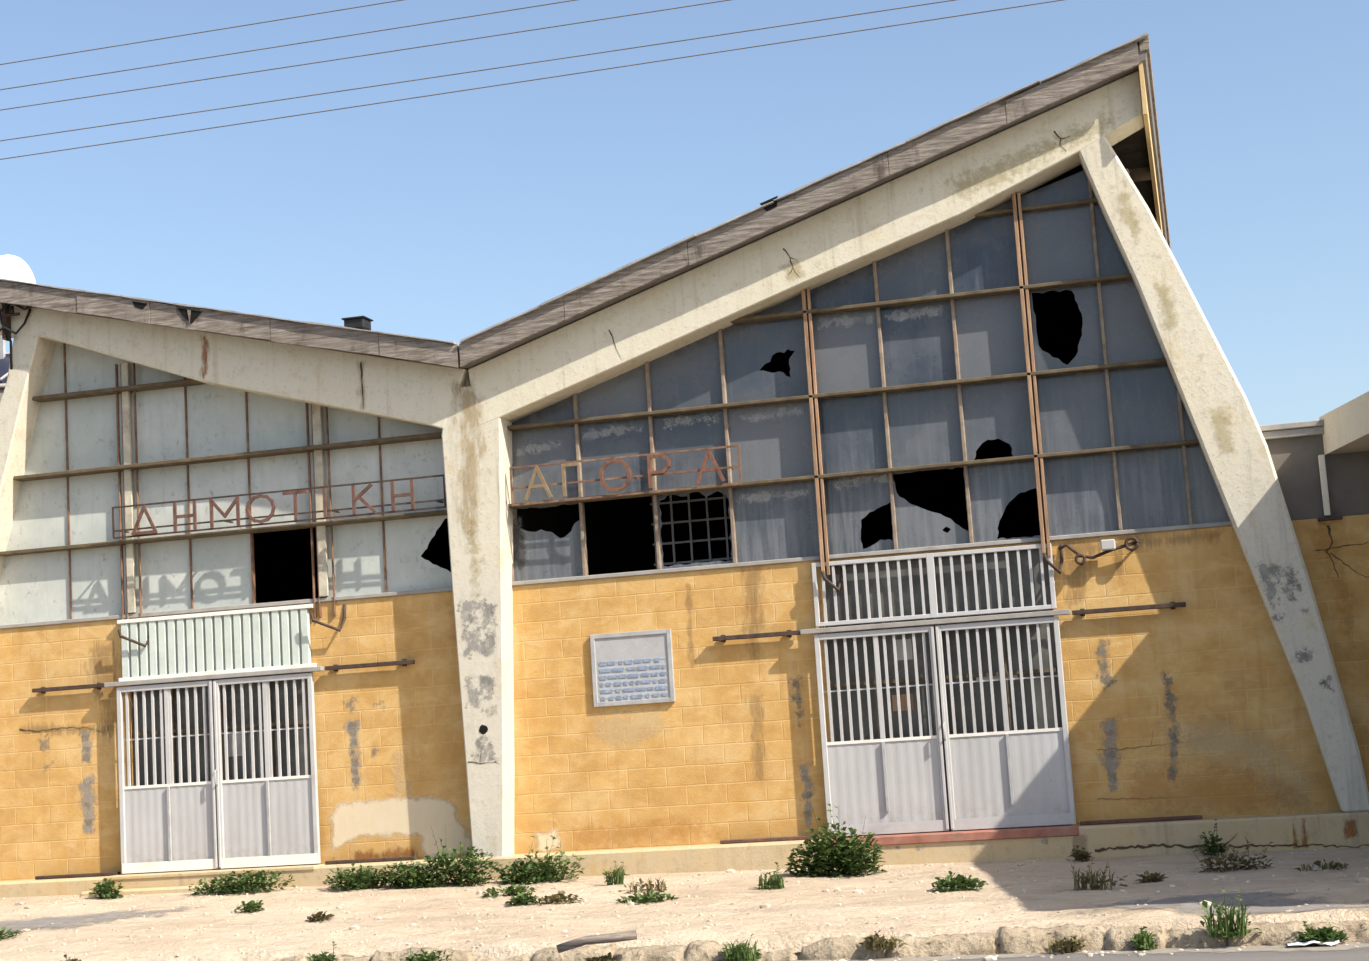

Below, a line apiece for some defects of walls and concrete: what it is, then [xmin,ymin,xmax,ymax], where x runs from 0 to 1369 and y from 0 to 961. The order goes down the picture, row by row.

crack [1315,525,1369,578]
peeling [1252,556,1311,622]
peeling [458,599,497,658]
peeling [465,676,499,762]
water stain [330,797,472,859]